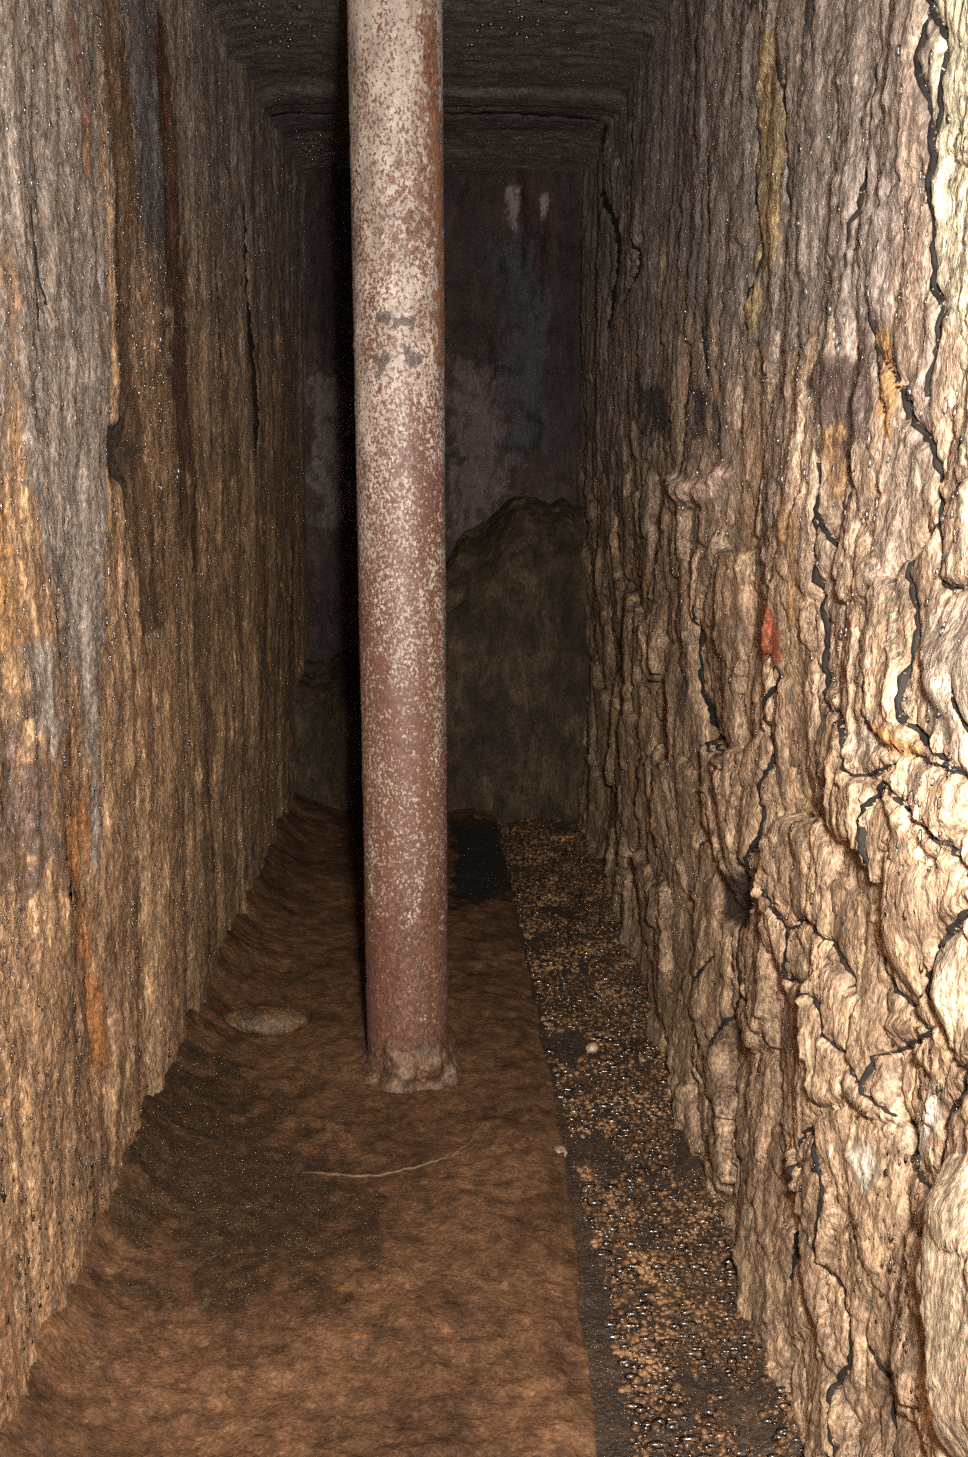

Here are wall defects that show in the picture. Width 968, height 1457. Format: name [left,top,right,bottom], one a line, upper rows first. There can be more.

rust [357,0,526,777]
crack [702,155,711,376]
crack [744,54,791,330]
crack [811,0,968,865]
crack [691,605,726,770]
crack [692,665,968,1196]
crack [785,1127,898,1457]